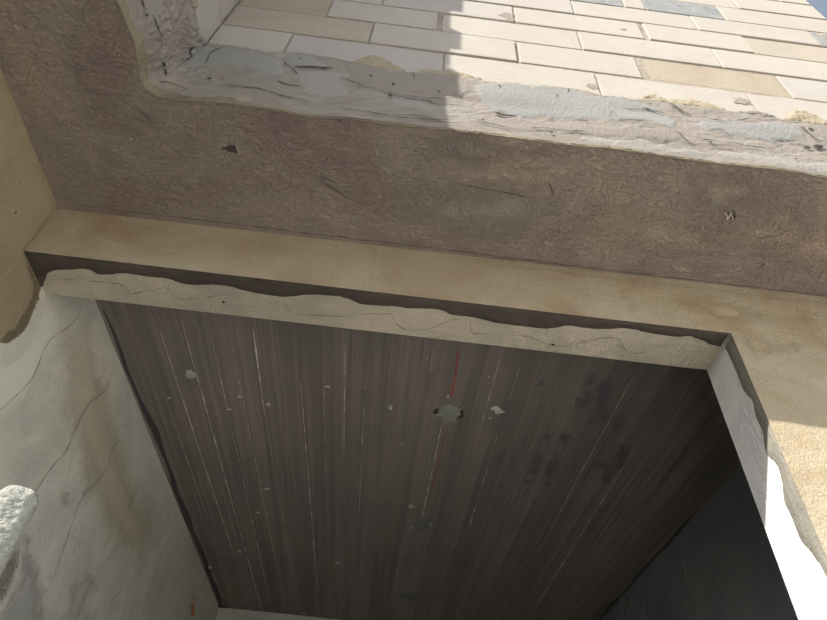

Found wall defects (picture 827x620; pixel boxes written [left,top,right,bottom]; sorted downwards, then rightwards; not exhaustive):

crack [0,308,81,410]
crack [35,371,113,492]
leakage [0,262,155,561]
leakage [0,533,46,620]